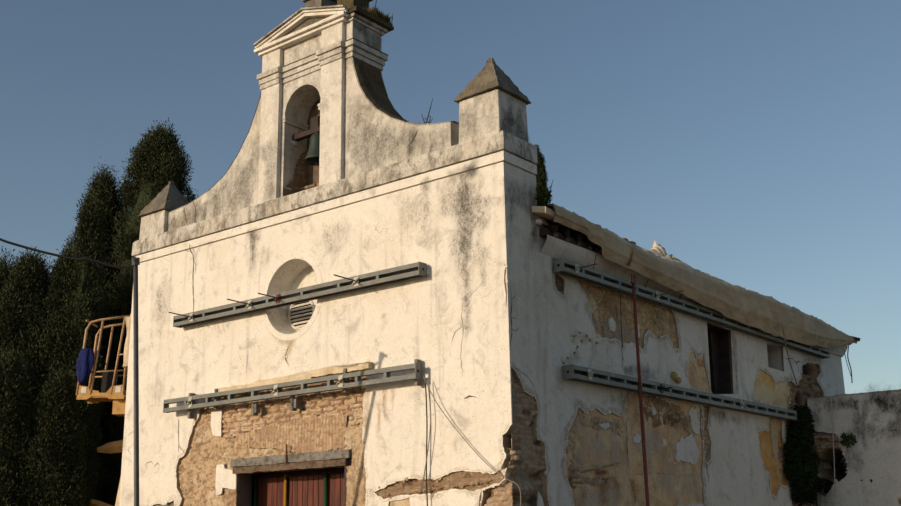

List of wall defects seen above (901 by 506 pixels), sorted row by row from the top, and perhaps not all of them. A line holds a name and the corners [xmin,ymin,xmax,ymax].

water stain [450,166,487,272]
crack [451,263,518,399]
flaking render [563,280,681,364]
flaking render [688,349,712,393]
flaking render [155,370,550,506]
flaking render [562,386,713,506]
flaking render [754,359,850,506]